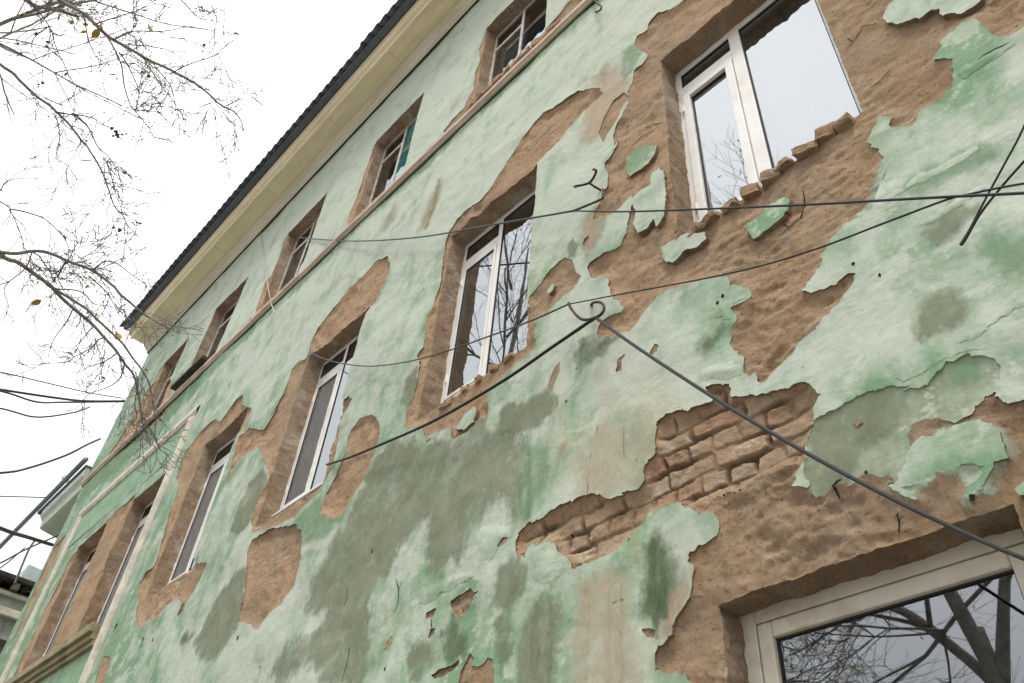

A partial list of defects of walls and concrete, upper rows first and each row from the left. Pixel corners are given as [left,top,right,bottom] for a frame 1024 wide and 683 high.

flaking render [405,0,1024,683]
flaking render [135,256,390,630]
leakage [500,392,558,435]
leakage [649,539,687,633]
leakage [494,616,512,664]